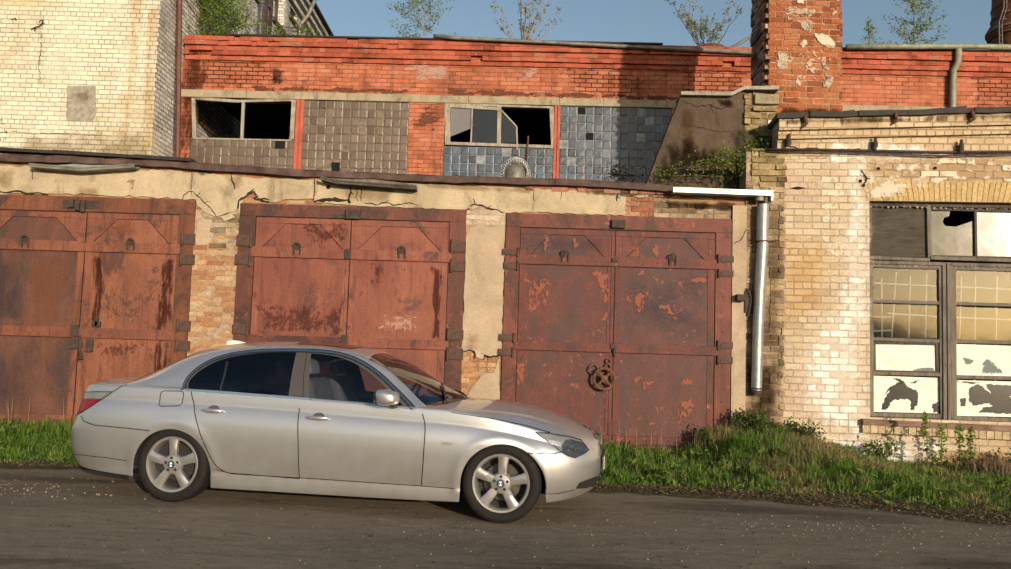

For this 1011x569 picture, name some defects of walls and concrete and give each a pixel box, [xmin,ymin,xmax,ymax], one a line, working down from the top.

crack [182,172,269,217]
peeling [860,157,1011,210]
spalling [209,200,243,248]
peeling [524,273,553,314]
peeling [592,270,610,334]
peeling [625,290,649,312]
spalling [461,351,498,393]